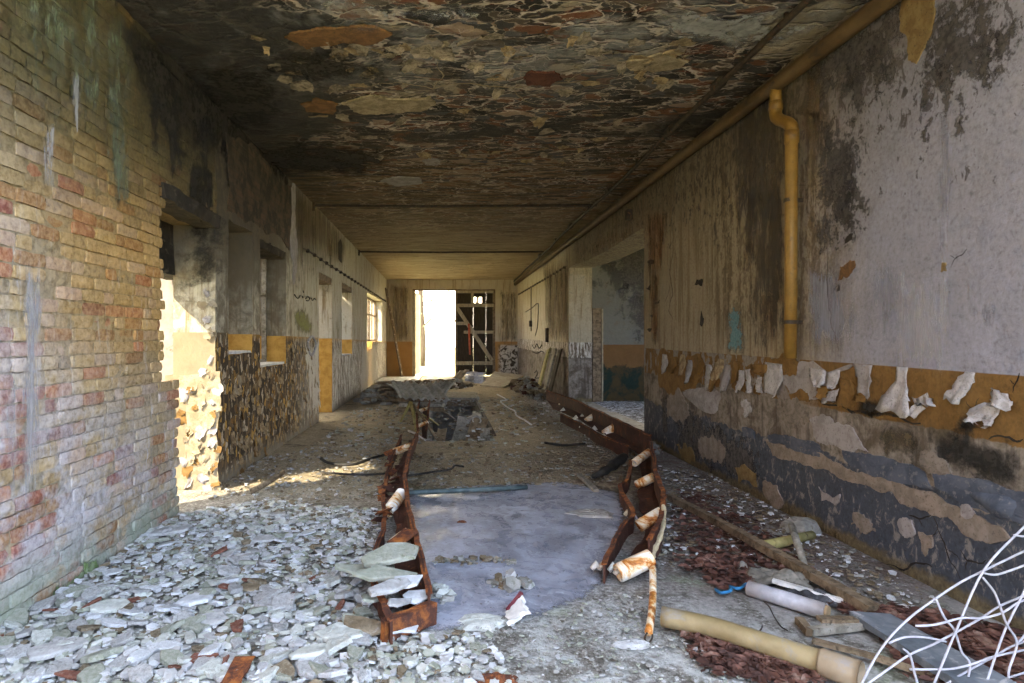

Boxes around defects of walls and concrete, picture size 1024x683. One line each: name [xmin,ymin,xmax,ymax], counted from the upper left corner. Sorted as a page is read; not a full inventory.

water stain [74,58,98,130]
spalling [380,176,422,187]
peeling [250,24,611,141]
peeling [455,114,623,170]
peeling [566,31,698,92]
water stain [733,102,784,349]
water stain [806,7,903,255]
spalling [899,0,936,64]
water stain [913,0,1023,153]
spalling [176,335,321,491]
peeling [658,348,1024,557]
water stain [879,416,1018,488]